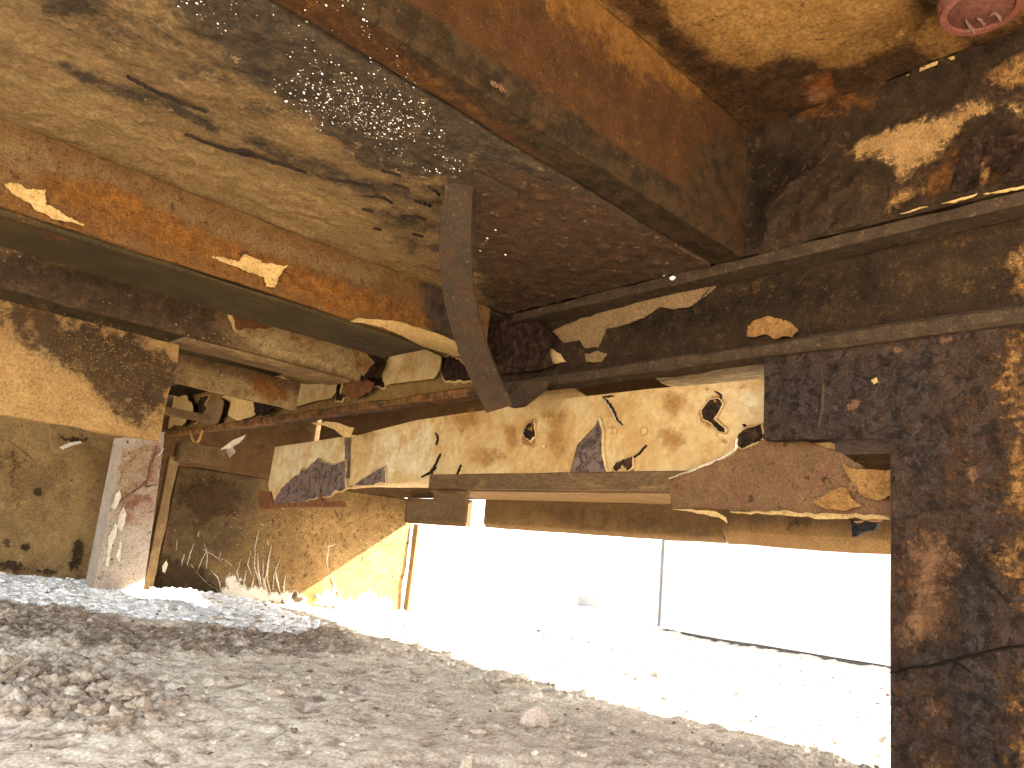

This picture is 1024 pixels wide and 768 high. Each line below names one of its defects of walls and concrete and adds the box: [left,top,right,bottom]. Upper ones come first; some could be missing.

peeling [4,183,85,226]
peeling [212,254,289,288]
damp [85,324,149,361]
rust [227,314,272,337]
peeling [236,318,461,386]
peeling [550,286,717,364]
damp [143,379,168,409]
spalling [569,416,609,473]
rust [1012,448,1024,504]
peeling [675,487,890,523]
rust [904,536,962,644]
crack [889,645,1024,673]